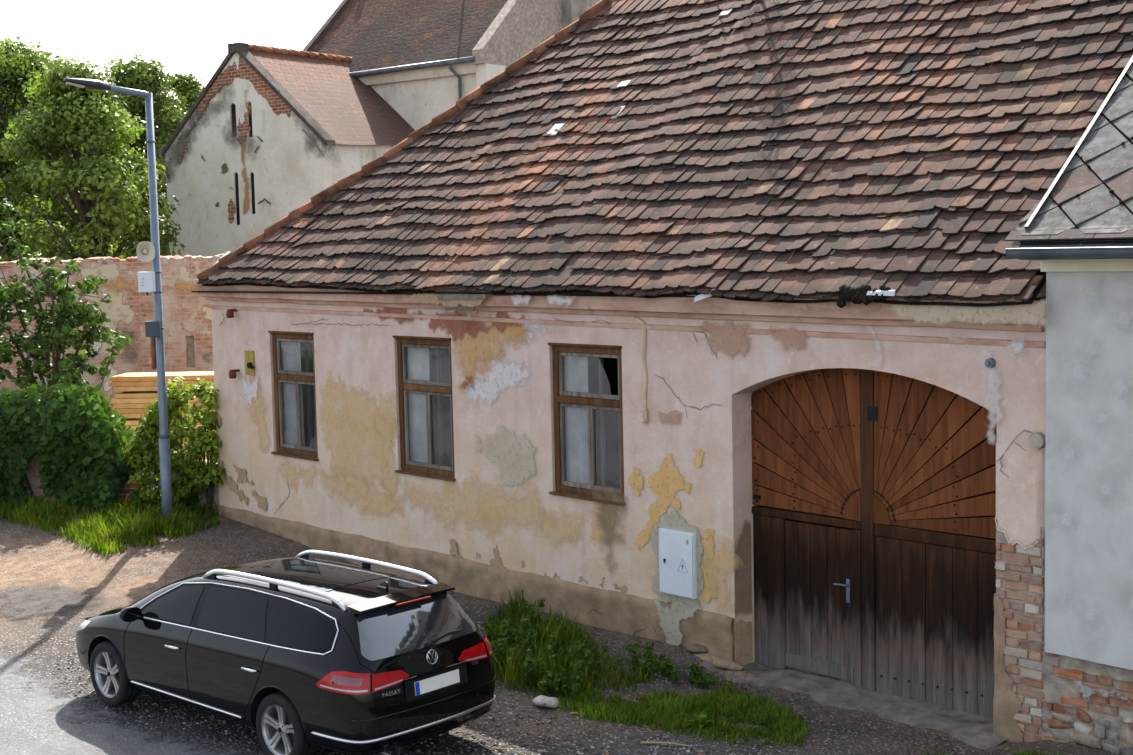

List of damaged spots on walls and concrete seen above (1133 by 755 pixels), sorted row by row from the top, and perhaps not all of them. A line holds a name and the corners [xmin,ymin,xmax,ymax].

flaking render [196,56,291,121]
flaking render [238,105,251,144]
crack [653,373,720,416]
flaking render [218,459,267,511]
peeling [628,453,691,550]
peeling [699,529,718,603]
flaking render [993,527,1133,743]